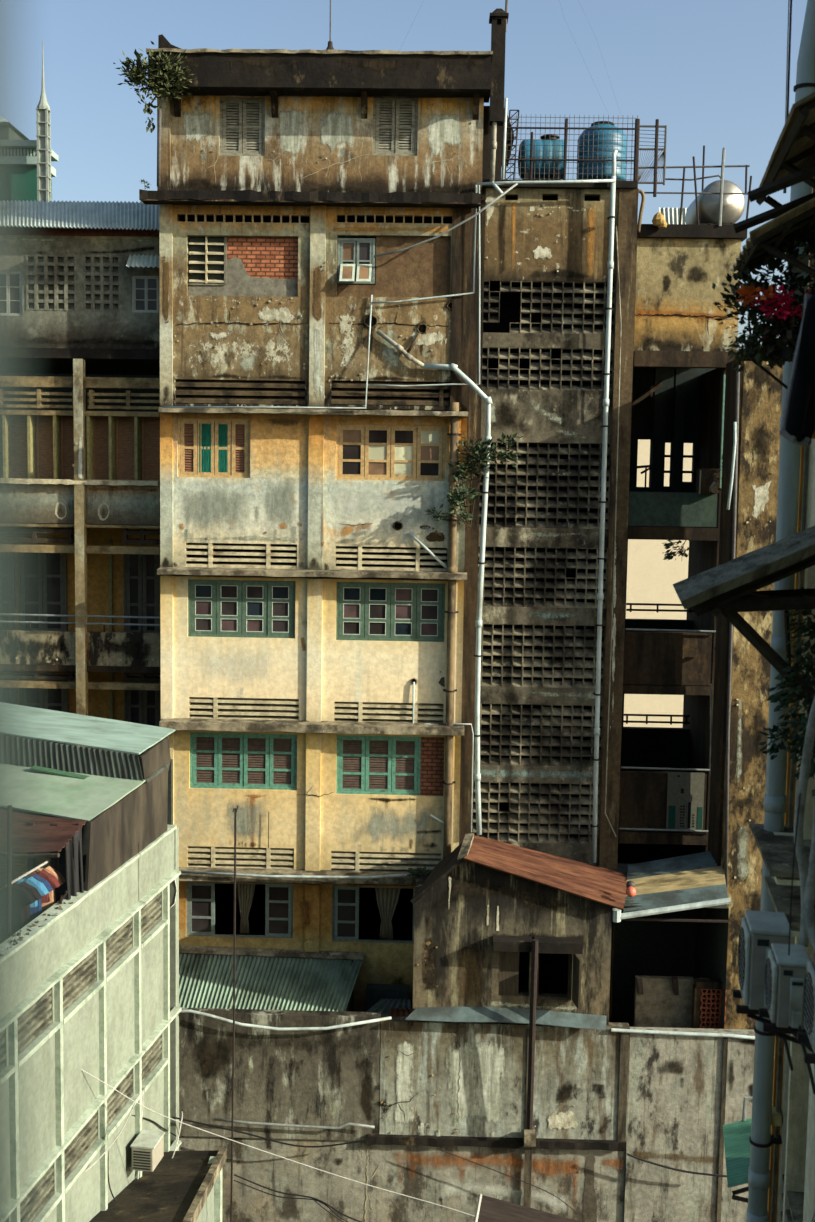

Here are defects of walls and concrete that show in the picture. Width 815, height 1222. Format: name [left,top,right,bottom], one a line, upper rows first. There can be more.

damp [407,183,475,193]
peeling [529,241,559,272]
damp [688,245,708,282]
peeling [163,256,327,378]
peeling [328,313,447,381]
damp [644,338,682,346]
damp [754,428,769,462]
damp [185,485,295,542]
damp [16,641,67,661]
damp [100,642,154,665]
damp [426,877,568,939]
damp [195,1034,373,1121]